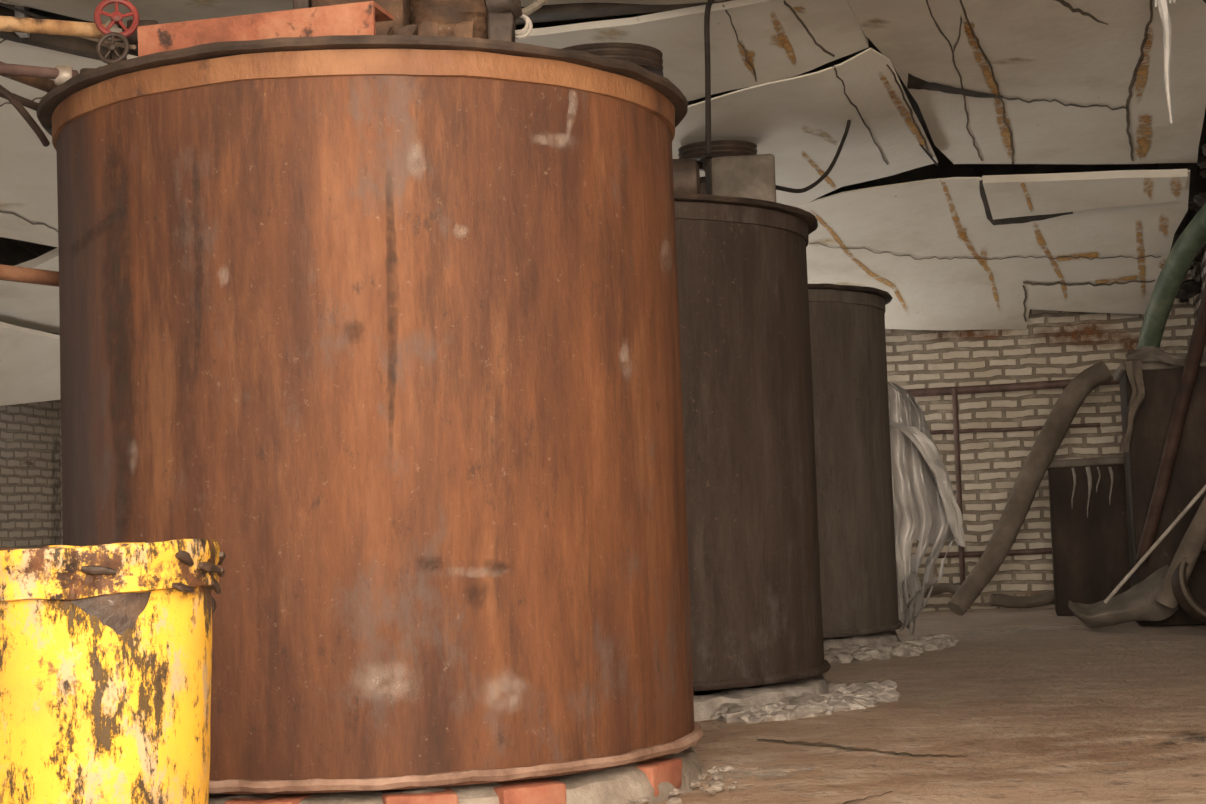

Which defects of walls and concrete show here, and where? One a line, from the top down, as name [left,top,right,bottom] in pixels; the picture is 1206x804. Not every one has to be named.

crack [722,5,757,82]
corrosion [772,16,796,64]
crack [784,1,888,165]
corrosion [965,24,1012,155]
crack [887,0,1153,225]
corrosion [815,215,905,307]
corrosion [943,183,998,306]
crack [809,243,1161,322]
corrosion [1035,230,1098,298]
corrosion [1096,222,1145,293]
crack [757,739,967,757]
crack [842,791,892,804]